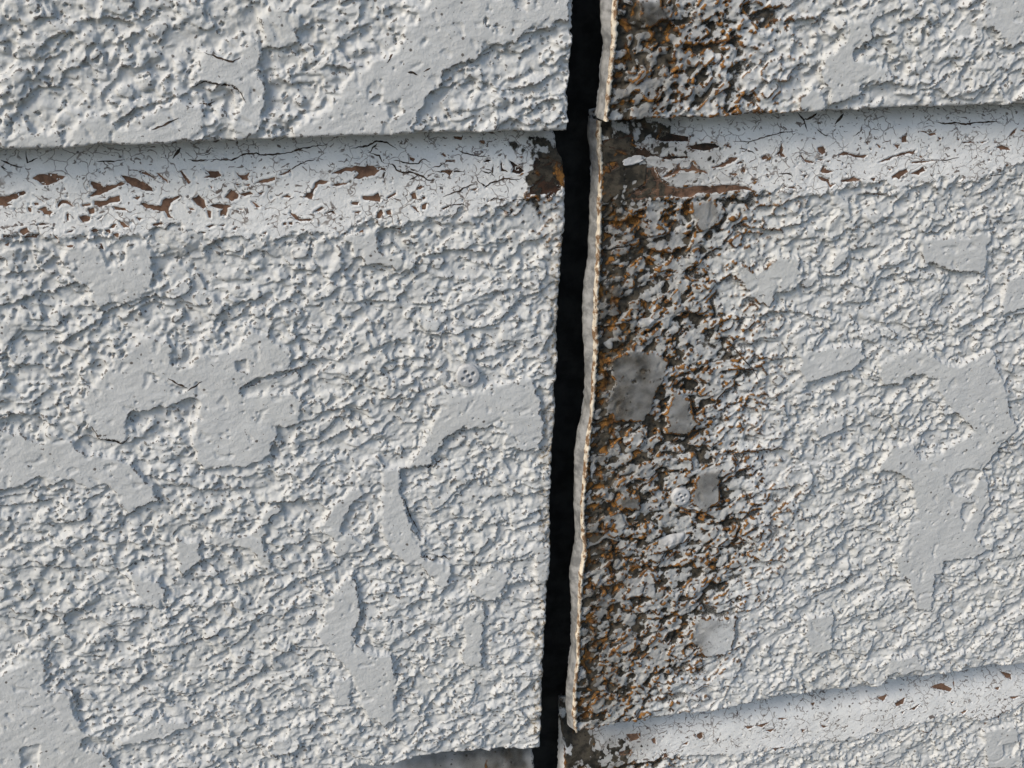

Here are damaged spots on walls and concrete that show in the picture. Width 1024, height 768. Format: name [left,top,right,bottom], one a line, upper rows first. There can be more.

peeling [0,170,179,249]
peeling [189,169,291,233]
peeling [283,164,384,225]
peeling [344,192,396,234]
peeling [484,156,563,199]
corrosion [504,136,565,240]
peeling [602,132,769,200]
peeling [800,135,935,195]
corrosion [559,0,817,768]
peeling [931,681,966,714]